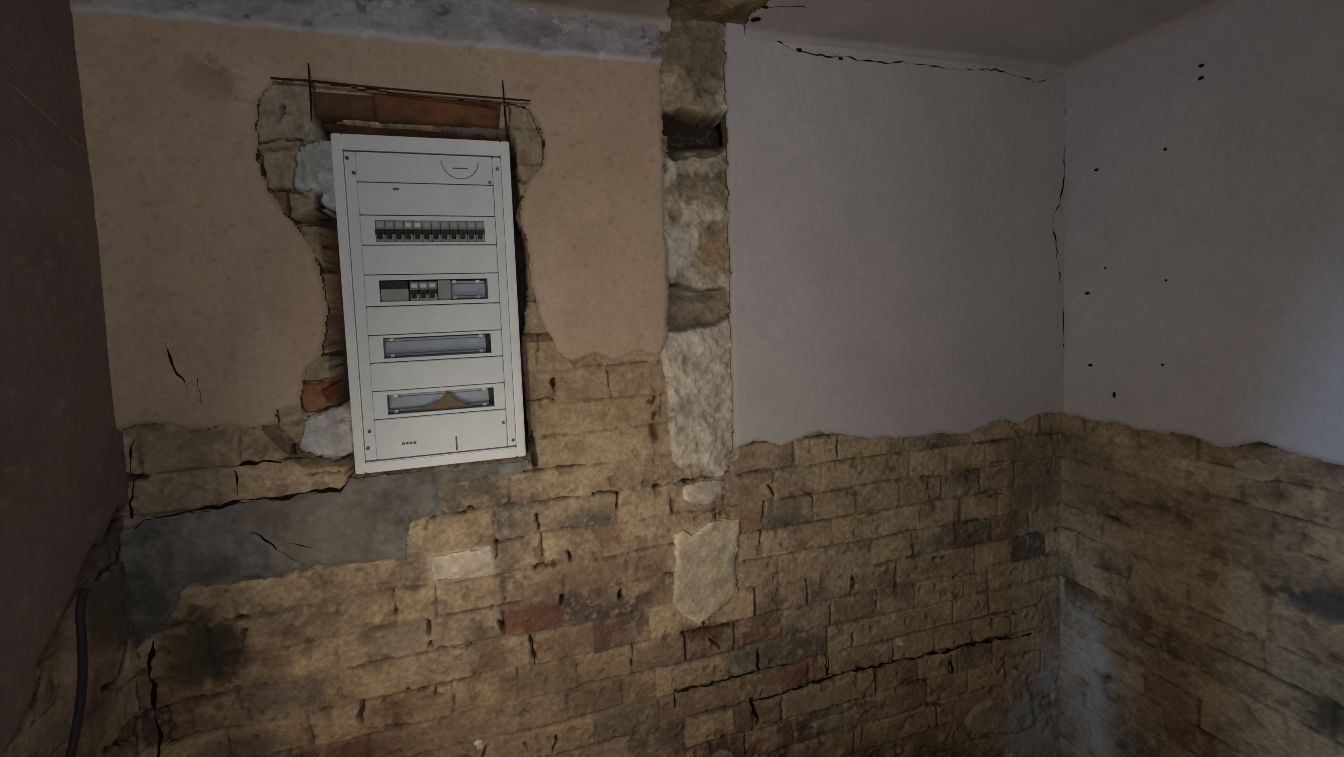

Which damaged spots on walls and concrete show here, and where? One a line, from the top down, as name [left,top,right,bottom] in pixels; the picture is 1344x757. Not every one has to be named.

crack [777,41,1047,82]
crack [1053,149,1065,361]
crack [163,342,203,409]
flaking render [1,81,723,757]
flaking render [682,413,1344,757]
damp [1266,584,1344,621]
crack [147,641,175,757]
crack [676,633,1031,701]